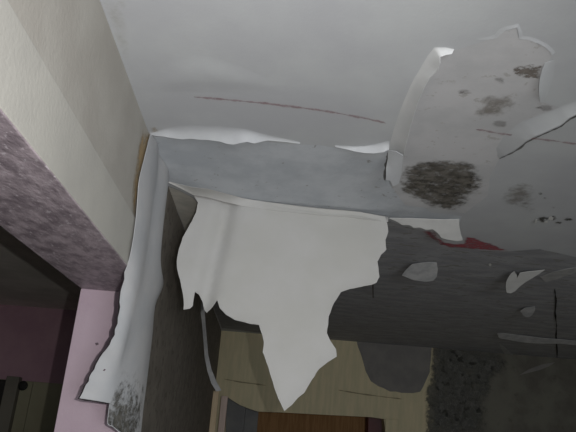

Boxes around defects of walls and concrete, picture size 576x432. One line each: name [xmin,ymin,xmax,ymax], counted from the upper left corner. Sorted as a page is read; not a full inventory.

water stain [514,66,541,78]
water stain [403,161,479,208]
peeling [141,24,576,432]
crack [552,289,560,355]
water stain [108,385,140,432]
water stain [426,348,576,432]